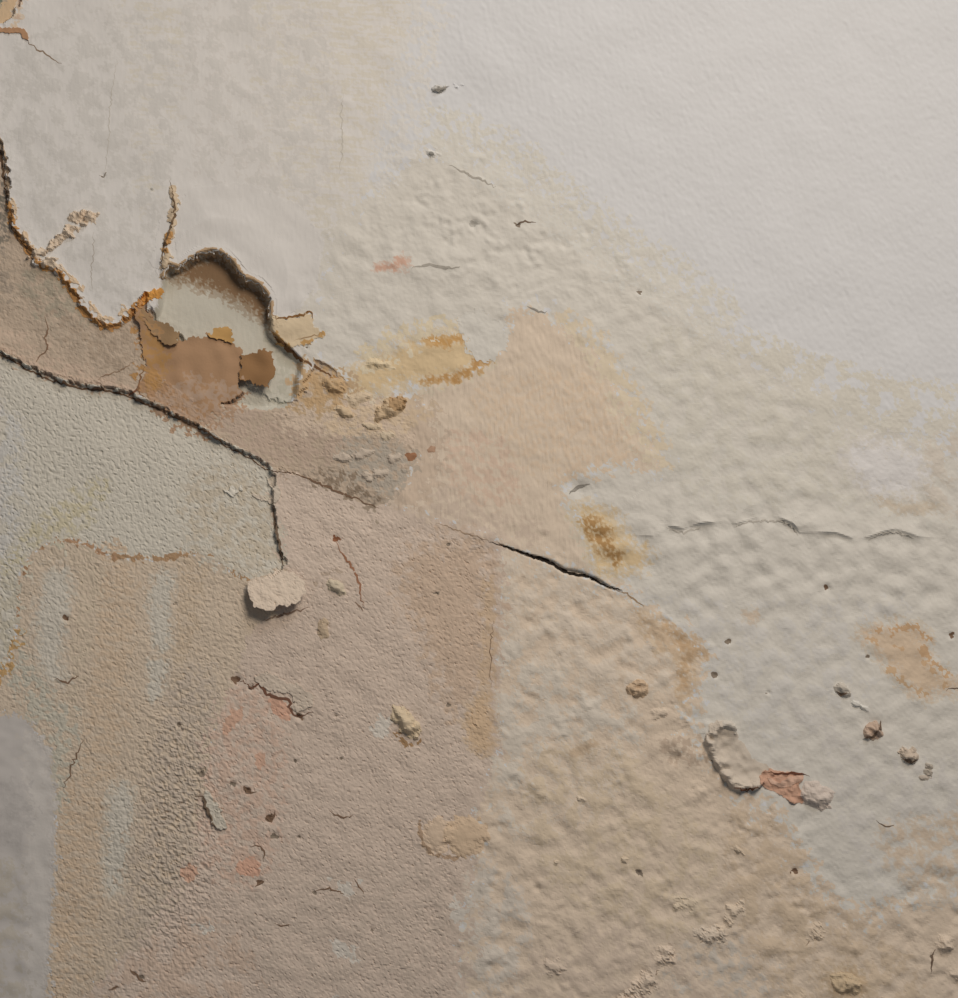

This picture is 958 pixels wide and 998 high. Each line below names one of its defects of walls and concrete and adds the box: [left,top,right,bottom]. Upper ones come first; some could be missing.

damp [0,0,29,28]
peeling [0,27,29,40]
crack [0,311,378,508]
crack [569,484,589,494]
spalling [0,138,511,998]
crack [272,503,283,565]
crack [336,542,365,611]
crack [438,523,642,605]
crack [736,519,798,535]
crack [868,531,914,541]